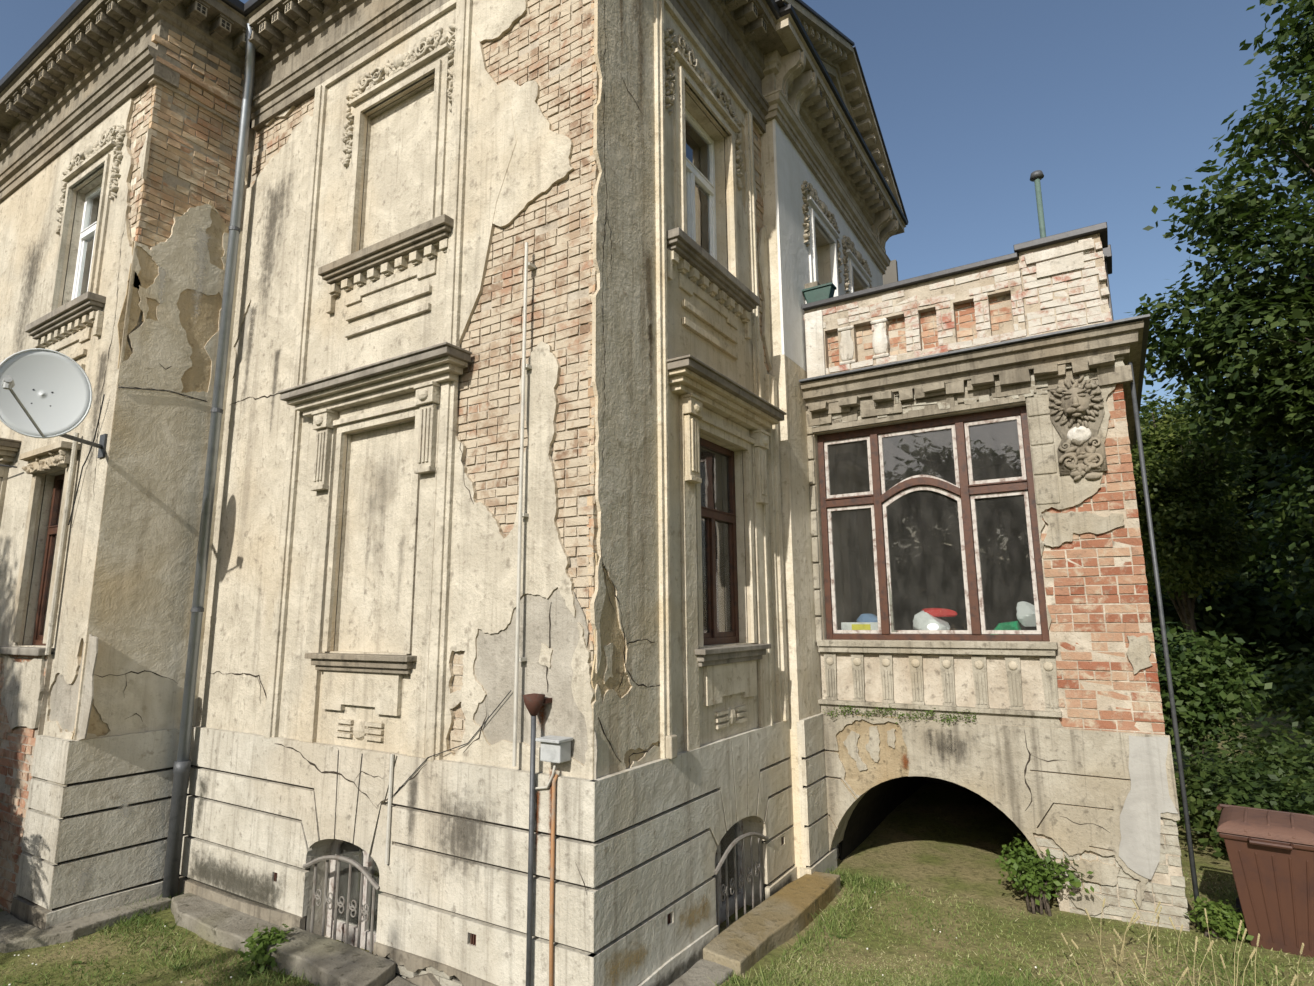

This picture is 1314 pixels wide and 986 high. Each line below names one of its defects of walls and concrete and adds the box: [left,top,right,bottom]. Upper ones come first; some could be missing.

spalling [250,95,315,187]
spalling [117,29,252,368]
peeling [177,289,222,393]
spalling [450,0,631,779]
spalling [811,371,1048,428]
spalling [1041,383,1165,735]
crack [598,544,660,765]
spalling [835,714,909,799]
damp [191,857,279,908]
damp [445,807,483,862]
spalling [1035,817,1190,932]